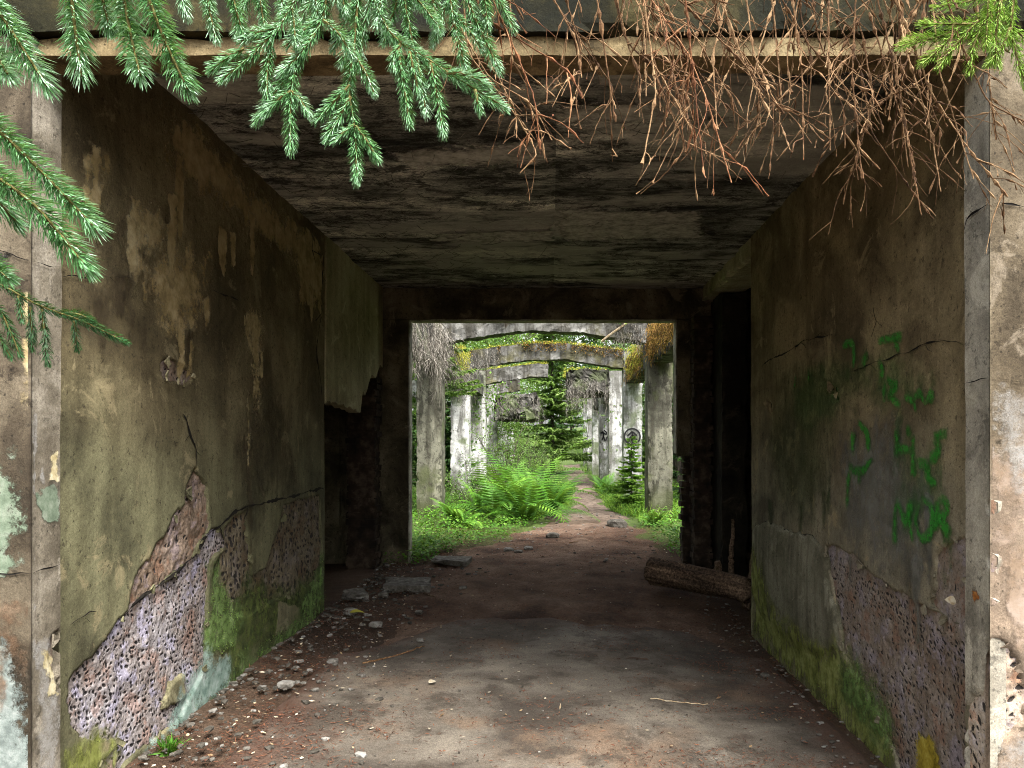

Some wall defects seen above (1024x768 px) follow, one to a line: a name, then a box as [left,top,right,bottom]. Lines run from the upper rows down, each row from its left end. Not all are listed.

leakage [82,145,111,212]
leakage [393,142,555,167]
leakage [562,105,670,123]
leakage [126,112,325,383]
leakage [430,207,704,242]
crack [850,309,961,372]
crack [183,414,199,459]
peeling [0,474,27,577]
peeling [0,637,28,768]
spalling [67,472,321,768]
spalling [824,535,990,768]
spalling [1000,643,1024,732]